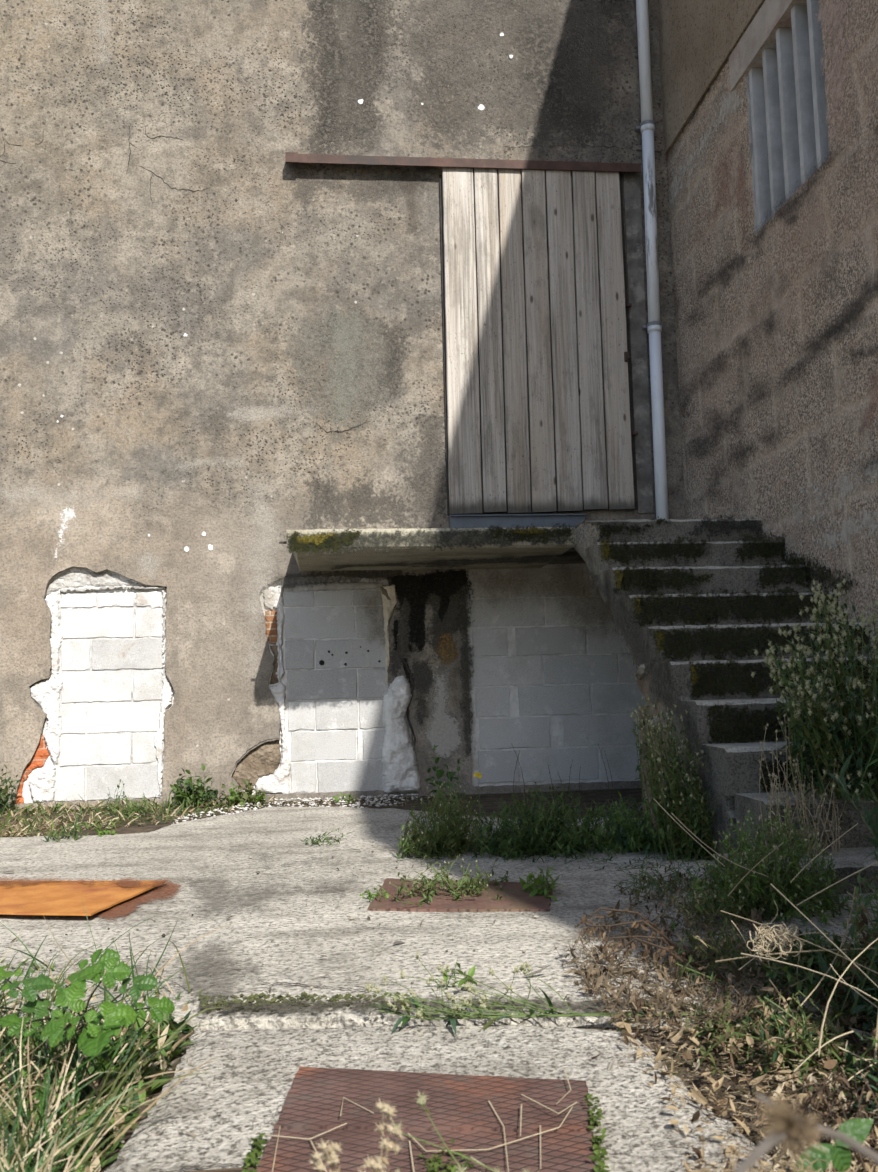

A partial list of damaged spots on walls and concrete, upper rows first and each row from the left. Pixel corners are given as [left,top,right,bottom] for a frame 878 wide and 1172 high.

leakage [289,0,638,211]
crack [126,127,210,203]
flaking render [264,610,279,684]
leakage [277,554,711,775]
flaking render [15,734,50,804]
flaking render [232,739,281,792]